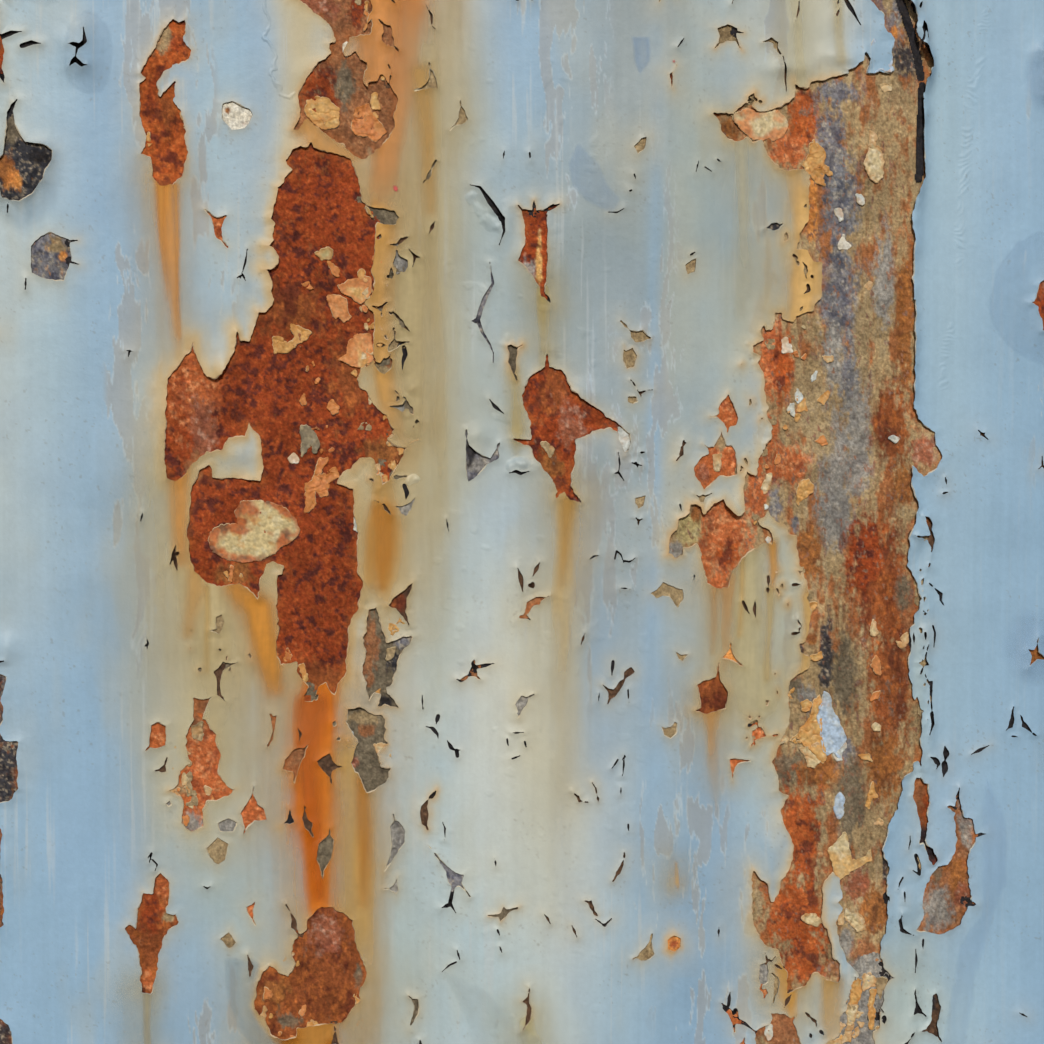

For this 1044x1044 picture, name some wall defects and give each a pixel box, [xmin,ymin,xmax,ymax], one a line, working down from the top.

peeling [0,99,52,203]
rust [301,119,351,158]
crack [896,0,928,182]
rust [153,178,179,338]
rust [787,169,823,322]
peeling [164,0,419,792]
rust [163,463,279,731]
rust [364,475,401,599]
rust [713,542,777,716]
peeling [668,0,984,1044]
peeling [0,675,18,802]
peeling [0,1019,12,1044]